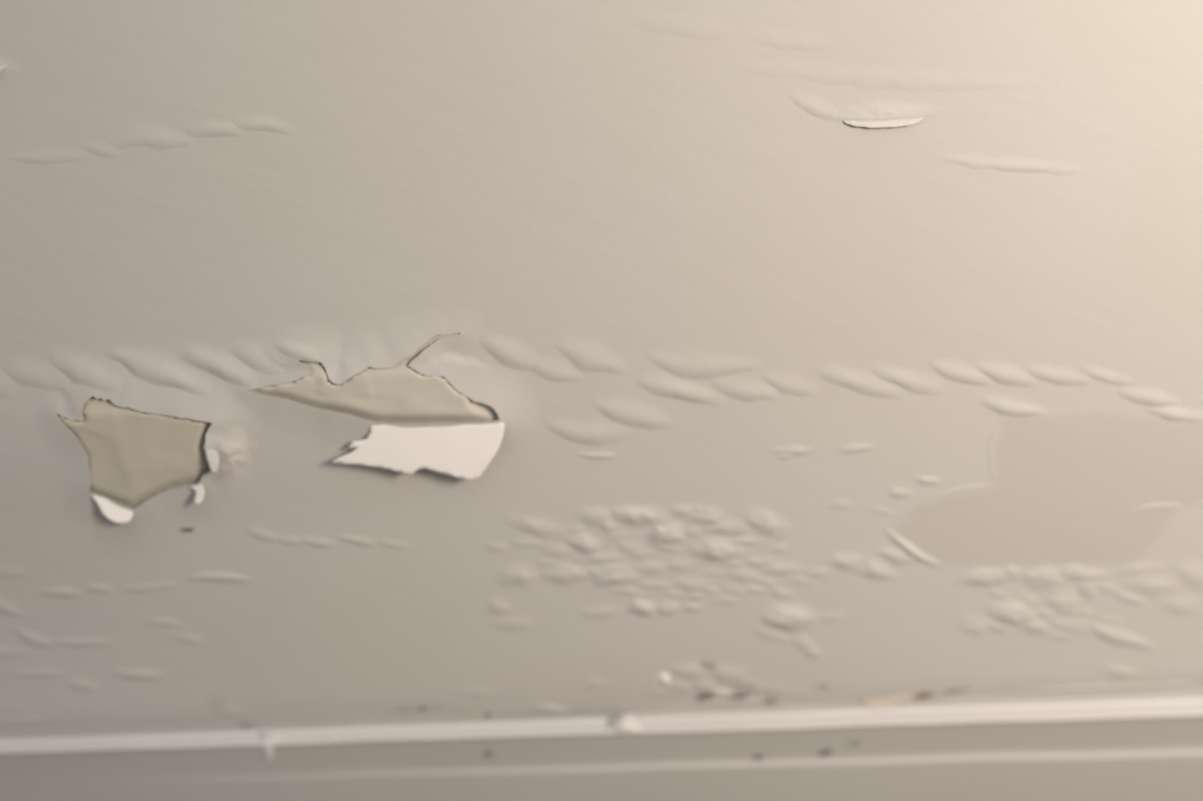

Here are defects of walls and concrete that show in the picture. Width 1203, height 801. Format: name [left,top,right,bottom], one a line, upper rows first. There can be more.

peeling [788,90,954,128]
peeling [26,302,549,561]